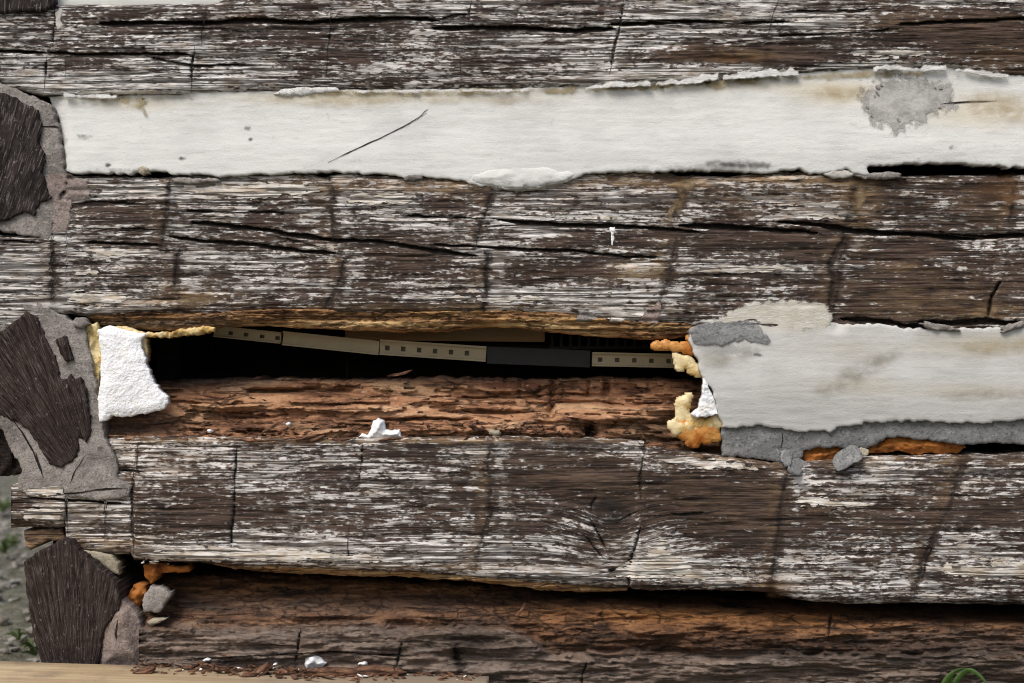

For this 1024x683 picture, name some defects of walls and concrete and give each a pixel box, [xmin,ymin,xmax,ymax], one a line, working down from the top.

crack [0,0,1024,93]
spalling [857,73,958,136]
crack [63,109,1024,329]
spalling [653,419,1024,475]